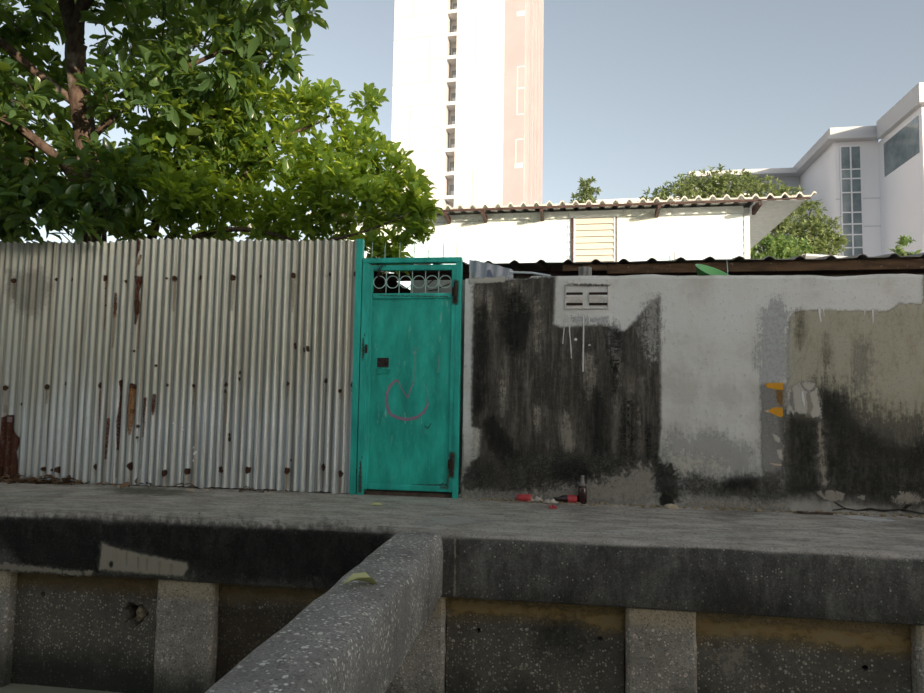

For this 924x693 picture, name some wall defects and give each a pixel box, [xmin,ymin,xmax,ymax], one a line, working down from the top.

corrosion [93,380,156,470]
leakage [459,276,924,511]
peeling [760,383,816,479]
leakage [0,514,389,588]